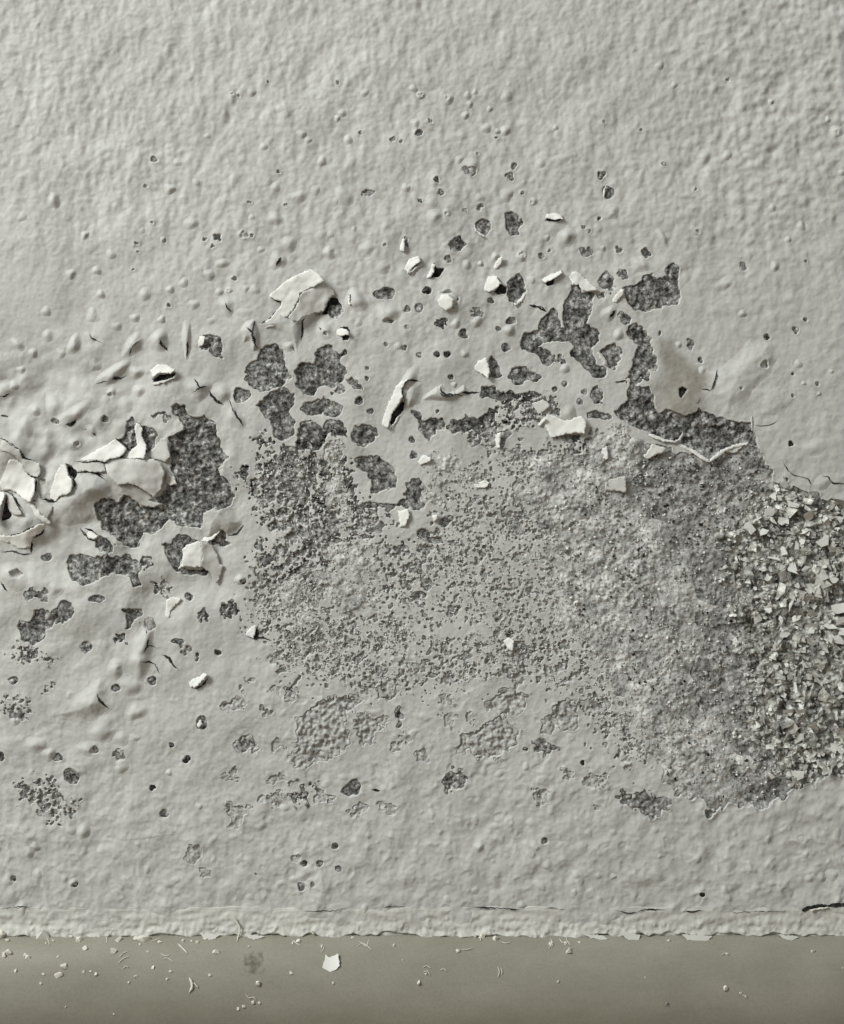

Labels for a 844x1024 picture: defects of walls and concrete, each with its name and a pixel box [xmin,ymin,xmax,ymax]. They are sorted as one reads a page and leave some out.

peeling [400,236,467,313]
flaking render [0,256,844,829]
crack [471,904,520,912]
crack [615,907,701,915]
crack [730,903,844,913]